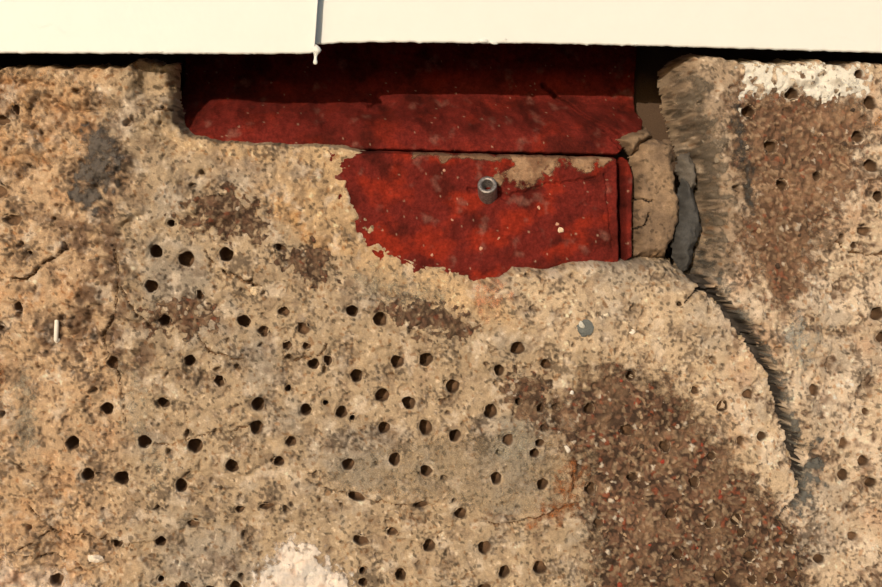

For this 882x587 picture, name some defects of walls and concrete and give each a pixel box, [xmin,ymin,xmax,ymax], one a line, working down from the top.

spalling [181,38,653,281]
crack [834,241,882,256]
crack [667,258,805,587]